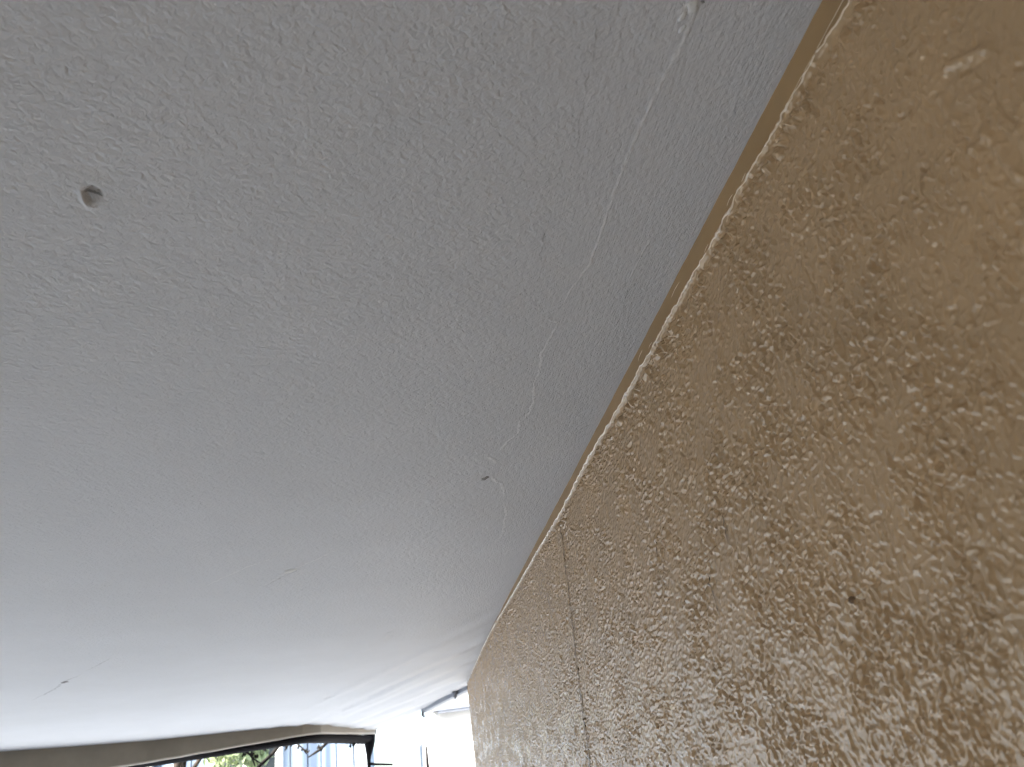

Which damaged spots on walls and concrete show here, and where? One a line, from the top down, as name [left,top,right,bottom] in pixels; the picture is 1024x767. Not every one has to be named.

crack [486,0,705,545]
crack [559,523,590,767]